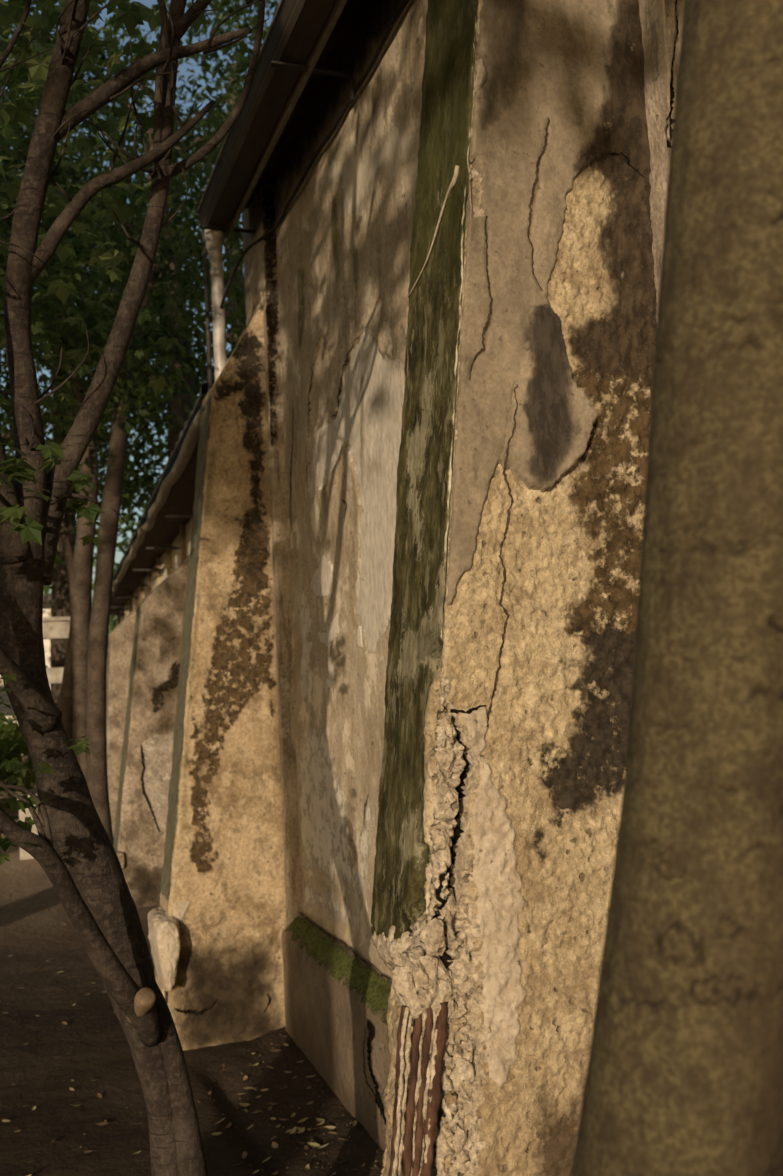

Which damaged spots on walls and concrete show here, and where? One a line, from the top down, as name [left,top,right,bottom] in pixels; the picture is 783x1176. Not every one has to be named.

water stain [482,0,524,125]
crack [668,0,679,144]
water stain [313,75,412,274]
crack [469,216,493,380]
crack [527,118,550,290]
water stain [188,188,279,873]
flaking render [310,327,405,654]
water stain [523,0,657,860]
water stain [149,662,180,713]
flaking render [280,555,340,774]
spalling [371,668,527,1176]
crack [363,1020,386,1130]